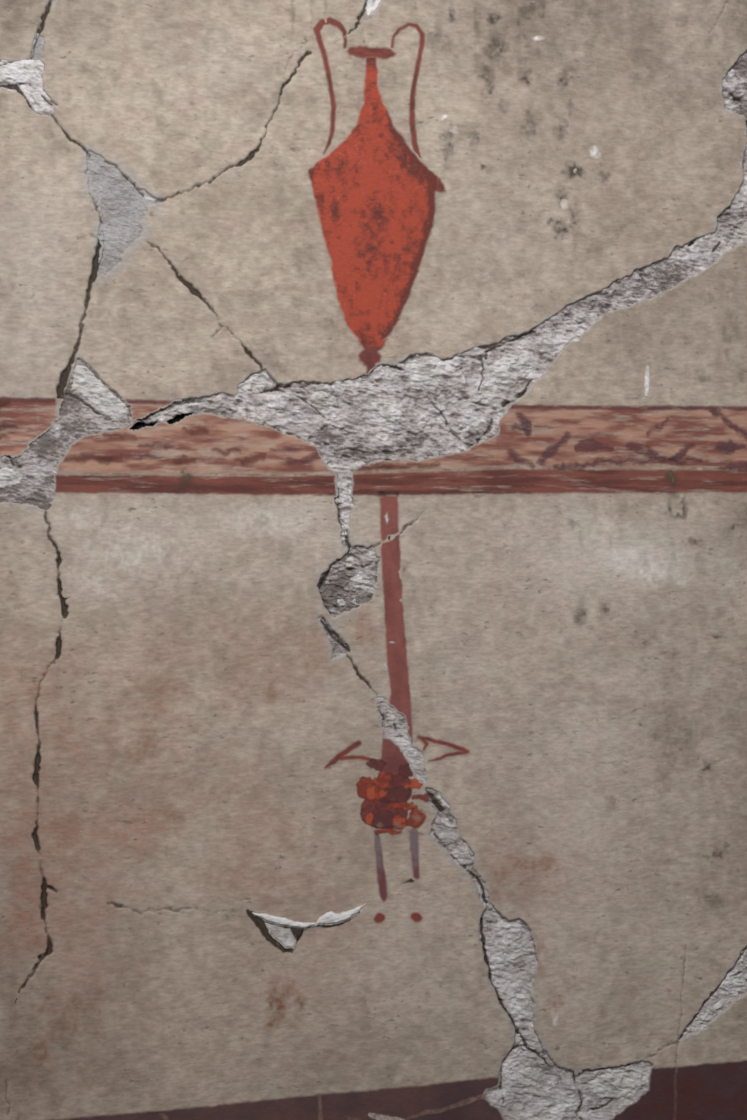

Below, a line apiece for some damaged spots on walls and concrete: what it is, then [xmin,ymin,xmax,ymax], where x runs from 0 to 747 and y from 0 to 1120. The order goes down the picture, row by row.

spalling [0,33,58,117]
crack [157,51,311,201]
spalling [722,51,747,133]
crack [57,208,104,414]
crack [148,242,214,312]
spalling [0,147,747,659]
crack [45,514,68,659]
crack [33,693,41,851]
crack [15,877,54,1003]
peeling [246,904,365,952]
spalling [368,696,651,1120]
spalling [680,947,747,1038]